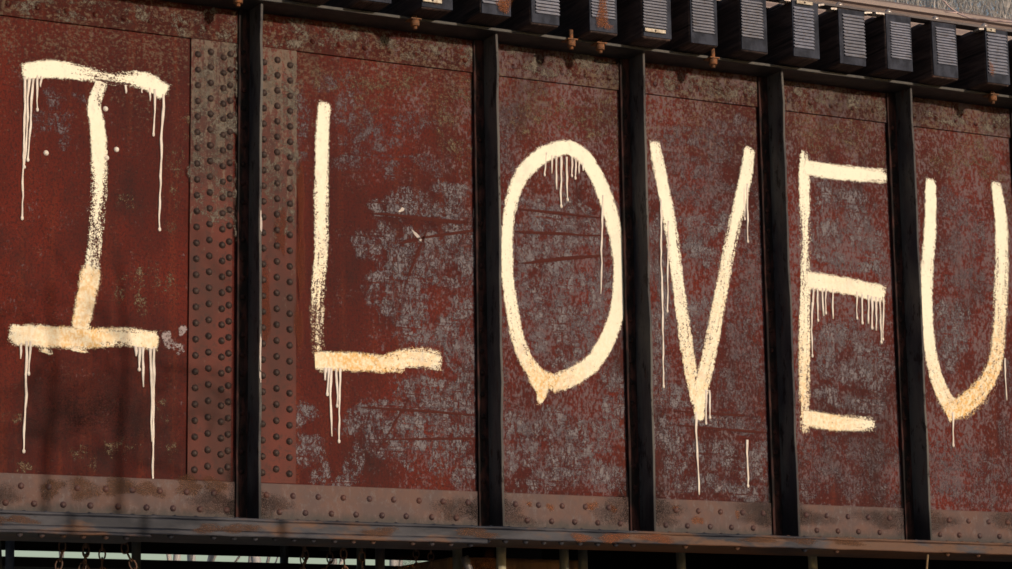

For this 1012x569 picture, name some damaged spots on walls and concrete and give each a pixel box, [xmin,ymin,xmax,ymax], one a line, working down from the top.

rust [495,0,514,14]
rust [570,532,675,544]